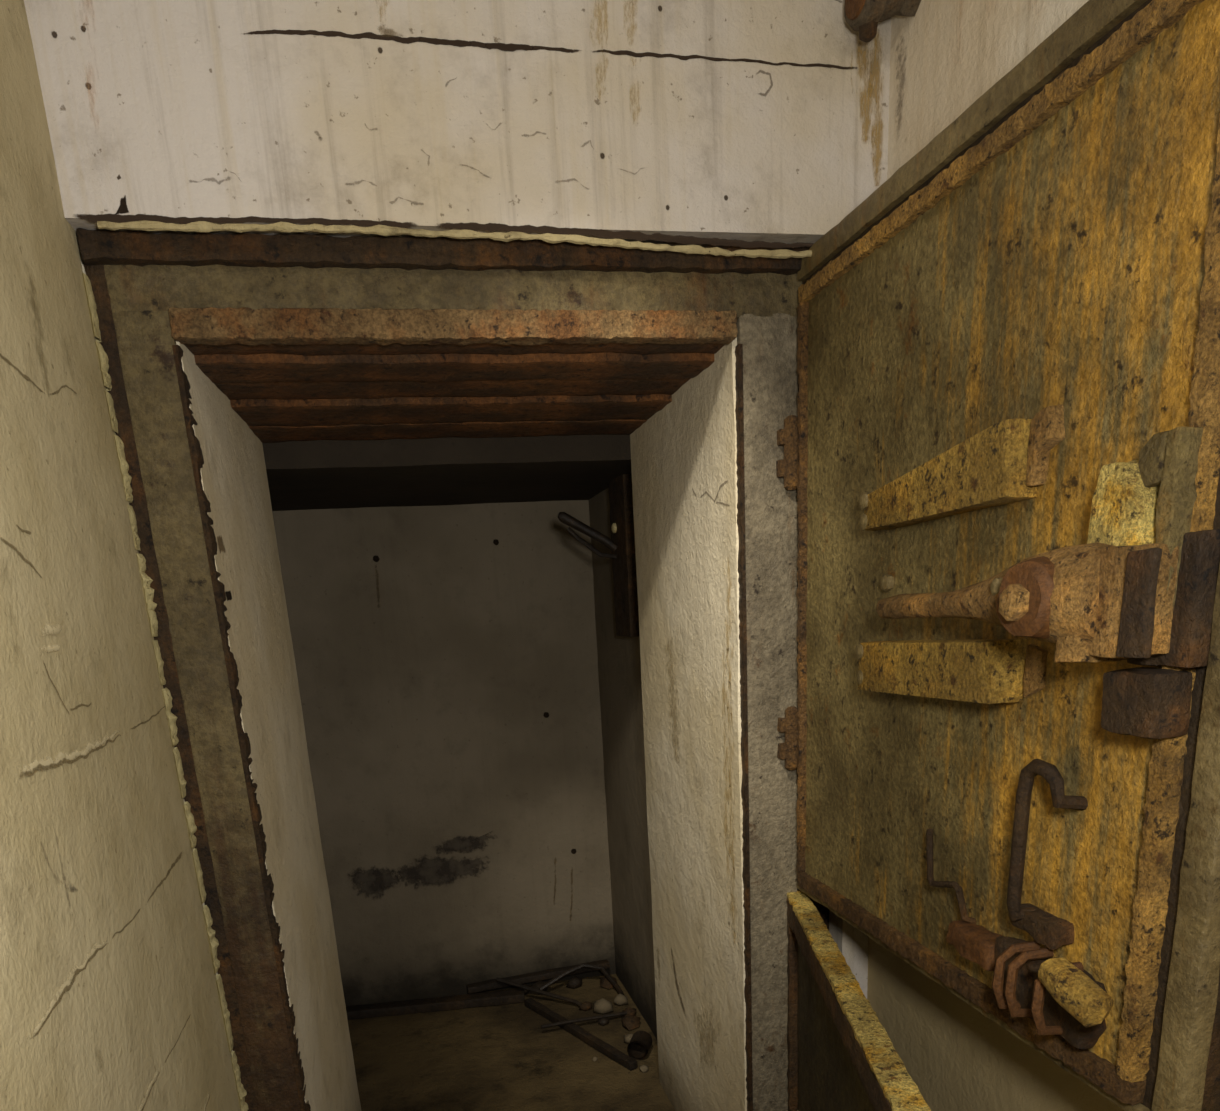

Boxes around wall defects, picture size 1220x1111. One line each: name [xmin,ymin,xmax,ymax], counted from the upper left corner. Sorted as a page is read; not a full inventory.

crack [244,28,857,70]
rust [857,33,883,186]
crack [0,354,77,395]
flaking render [82,273,248,1111]
crack [20,707,164,776]
peeling [348,834,494,899]
crack [29,854,181,1037]